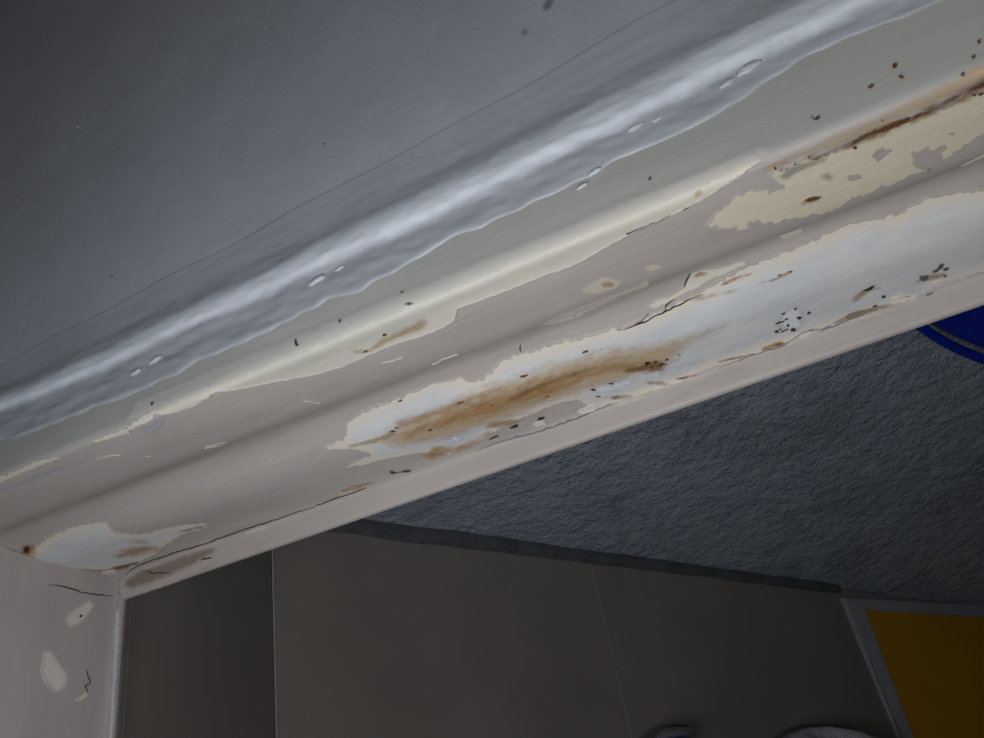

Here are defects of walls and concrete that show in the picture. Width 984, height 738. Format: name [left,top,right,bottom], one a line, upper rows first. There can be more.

corrosion [809,55,984,159]
peeling [91,146,768,442]
peeling [323,86,984,469]
corrosion [763,308,811,350]
corrosion [355,342,684,458]
peeling [0,454,62,491]
peeling [28,521,212,576]
crack [119,487,366,598]
peeling [40,585,108,693]